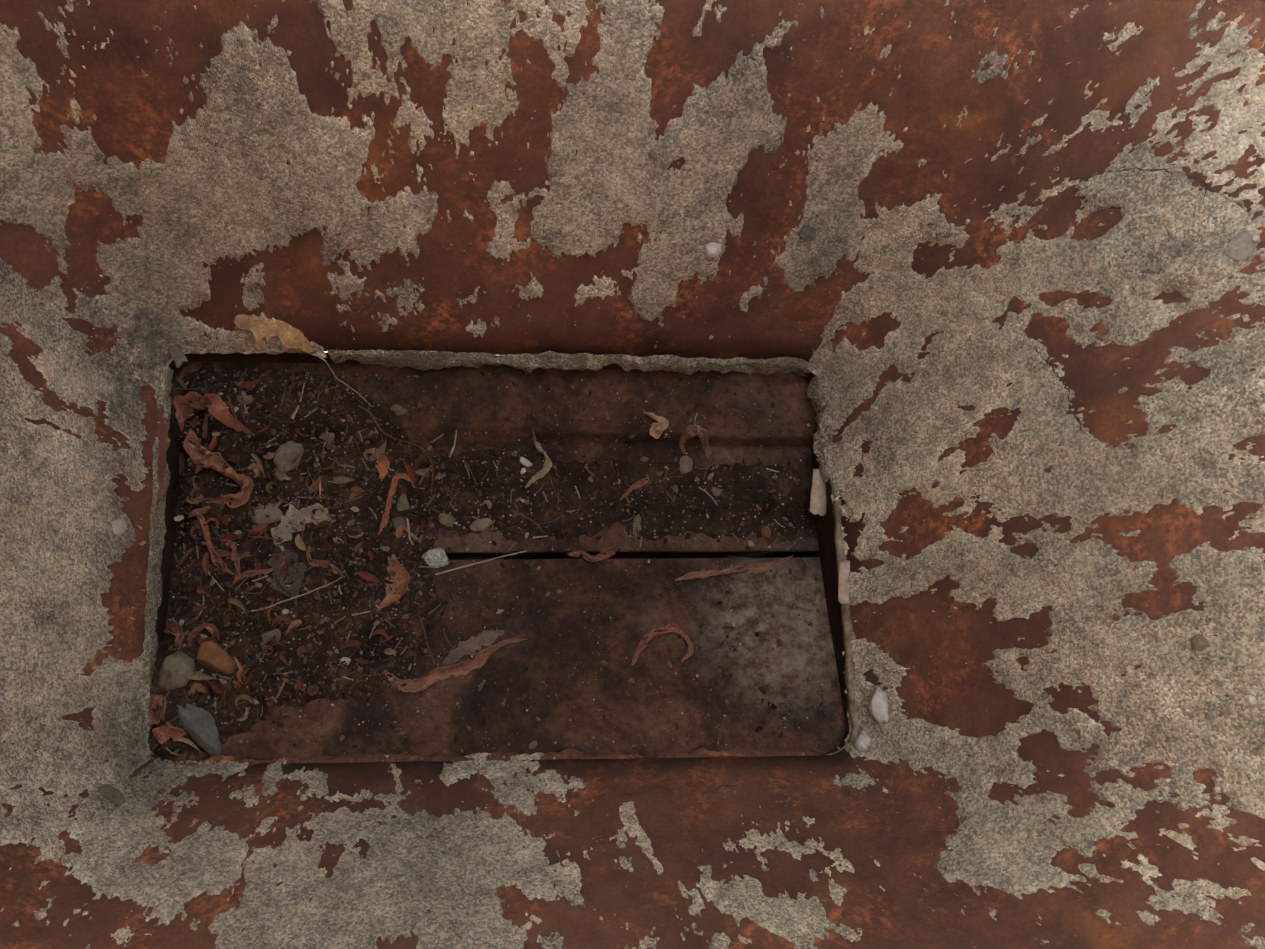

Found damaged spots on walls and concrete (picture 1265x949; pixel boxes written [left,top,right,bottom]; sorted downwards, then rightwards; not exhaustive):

peeling [962,0,1265,228]
peeling [321,252,397,340]
peeling [466,316,500,338]
peeling [506,272,544,317]
corrosion [992,286,1265,443]
corrosion [1228,433,1265,462]
corrosion [879,487,1265,621]
peeling [374,755,433,811]
corrosion [58,830,83,854]
peeling [250,812,278,838]
peeling [1157,804,1265,871]
peeling [1066,831,1252,926]